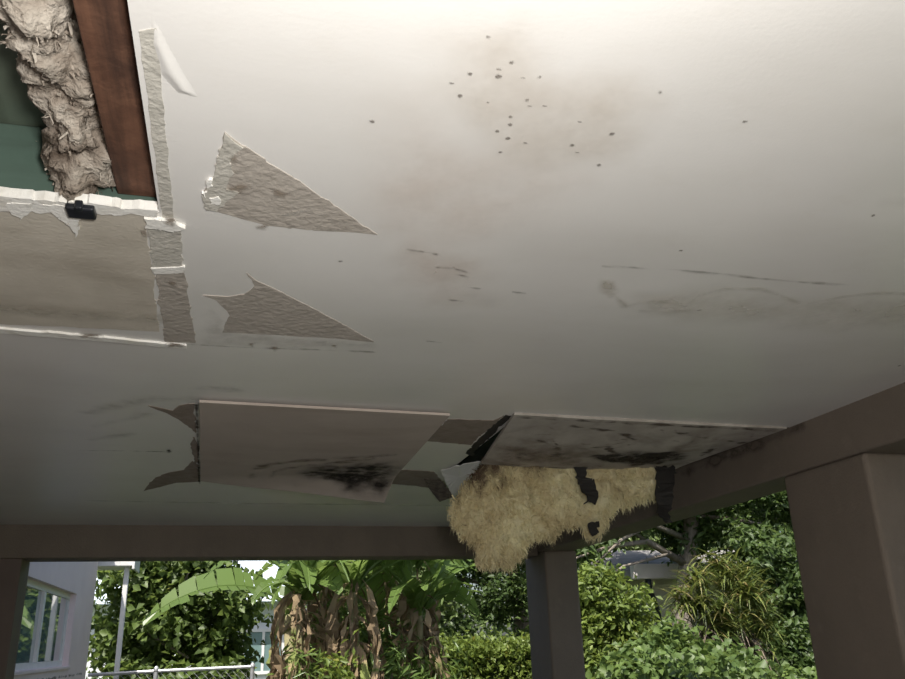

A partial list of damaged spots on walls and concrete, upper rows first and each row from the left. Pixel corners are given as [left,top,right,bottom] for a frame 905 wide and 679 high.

flaking render [202,132,378,235]
peeling [0,204,160,332]
flaking render [203,273,374,346]
water stain [304,464,388,489]
water stain [596,446,683,466]